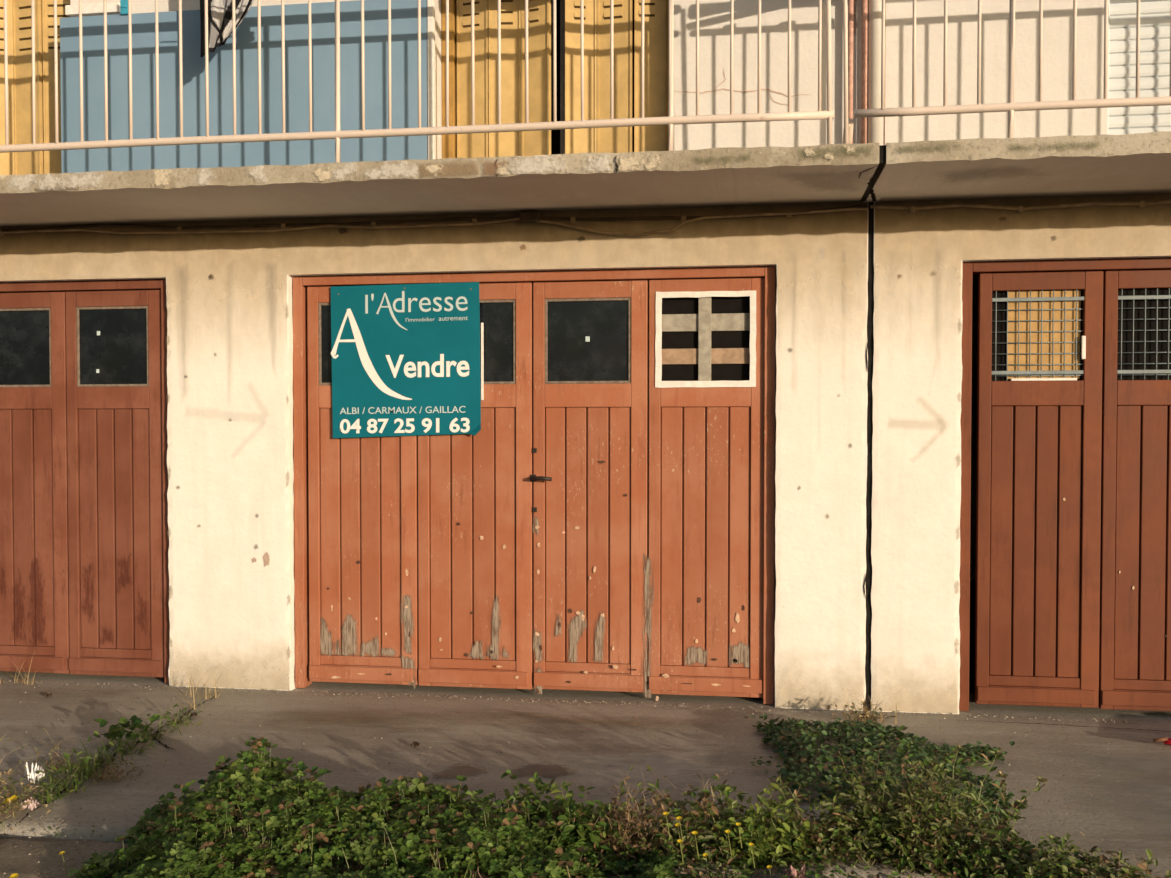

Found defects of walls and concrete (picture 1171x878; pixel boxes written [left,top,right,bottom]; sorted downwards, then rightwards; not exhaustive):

crack [677,68,809,105]
peeling [320,595,415,689]
peeling [465,595,508,668]
peeling [533,631,544,672]
peeling [555,608,618,674]
peeling [633,554,669,701]
peeling [685,605,750,668]